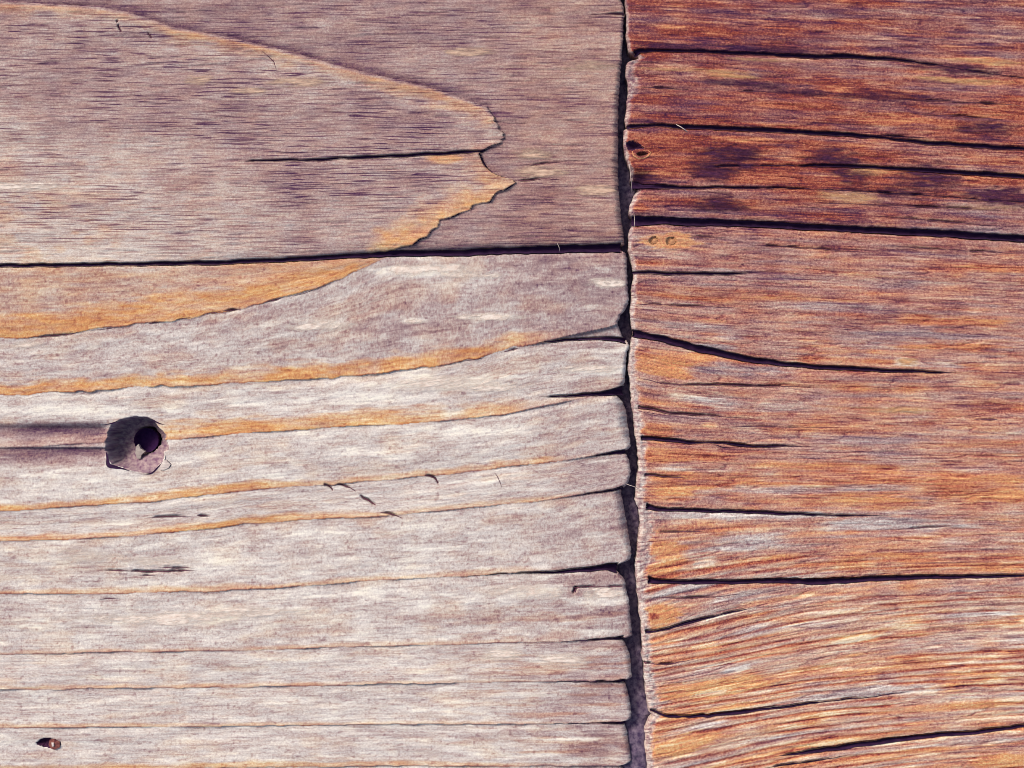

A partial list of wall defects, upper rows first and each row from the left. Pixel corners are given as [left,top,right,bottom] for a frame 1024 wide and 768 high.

crack [0,99,1024,275]
crack [632,330,947,387]
crack [767,724,1024,768]